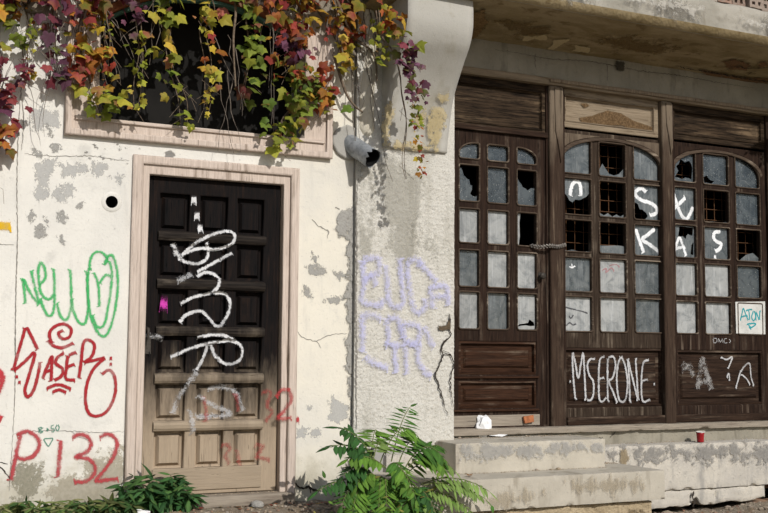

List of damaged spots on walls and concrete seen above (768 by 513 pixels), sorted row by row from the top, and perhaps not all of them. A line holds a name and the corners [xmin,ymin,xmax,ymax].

peeling [28,106,124,239]
peeling [381,93,449,153]
crack [0,13,129,479]
spalling [304,206,354,425]
crack [435,314,455,414]
peeling [296,426,321,438]